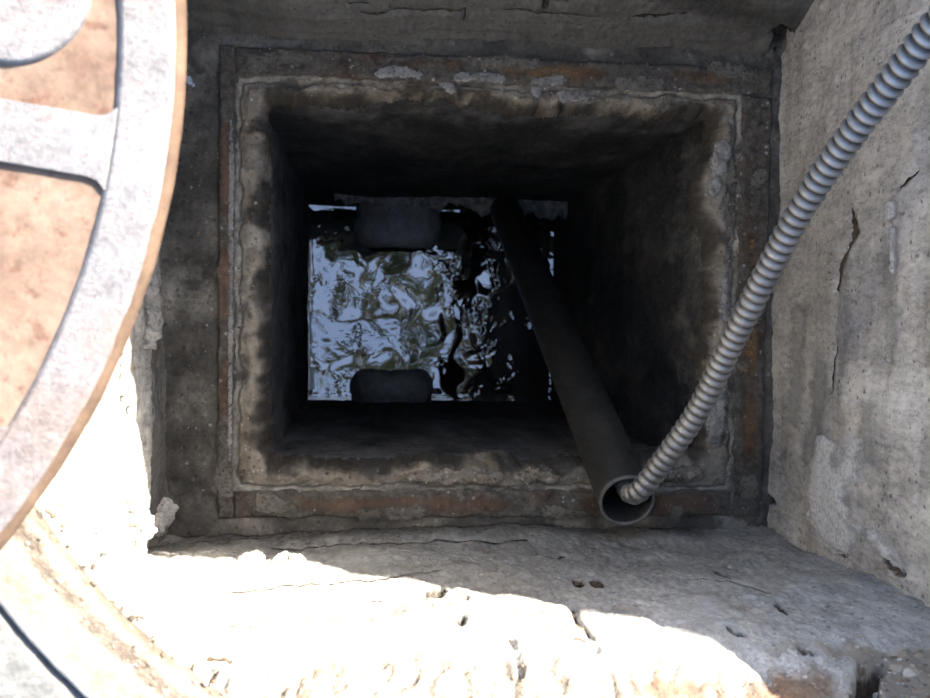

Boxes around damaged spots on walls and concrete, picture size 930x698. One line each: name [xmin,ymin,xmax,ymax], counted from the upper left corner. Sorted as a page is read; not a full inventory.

crack [347,2,467,21]
crack [836,208,859,292]
crack [831,346,839,386]
crack [273,539,565,560]
crack [220,570,440,606]
crack [682,578,770,594]